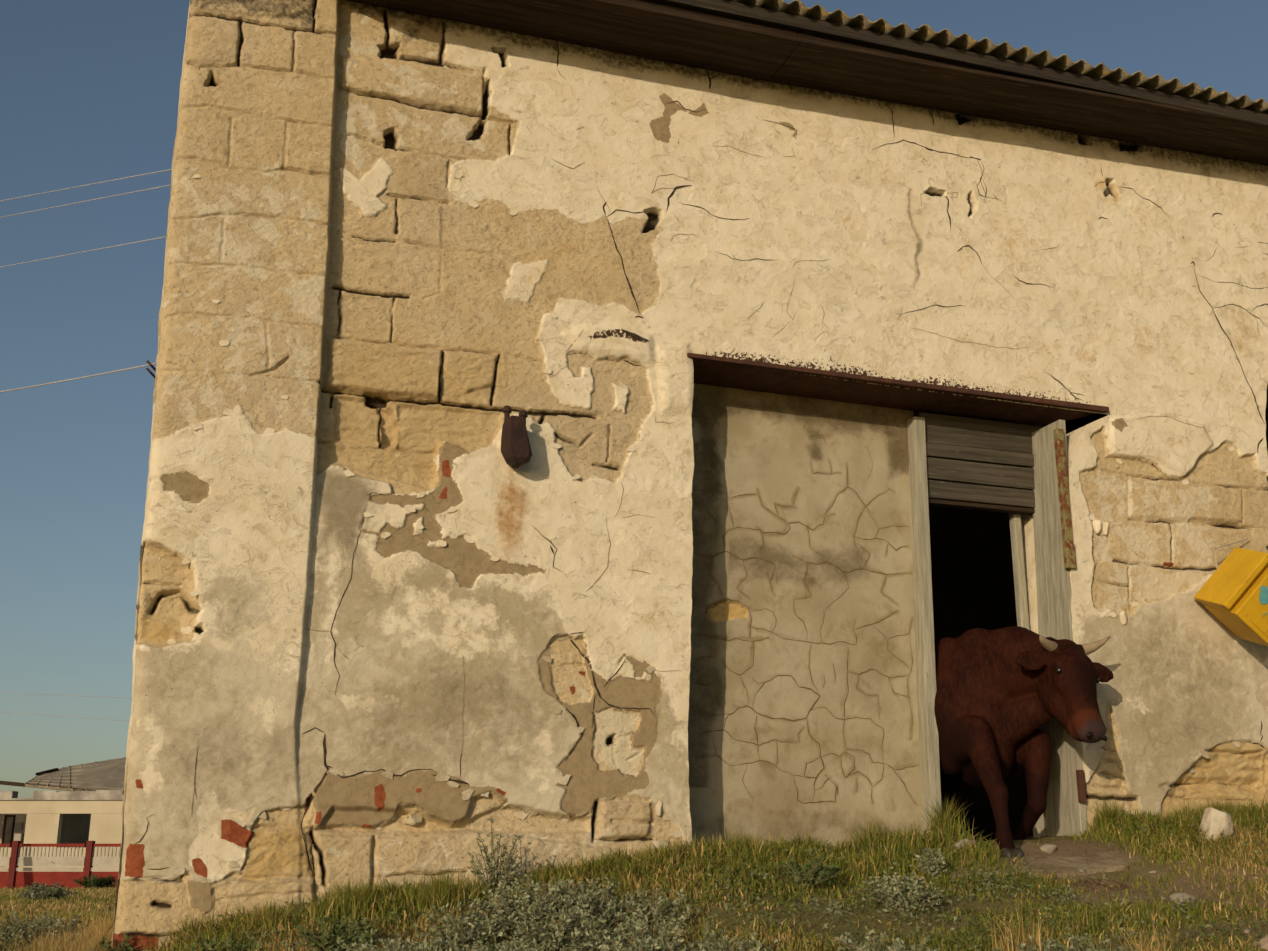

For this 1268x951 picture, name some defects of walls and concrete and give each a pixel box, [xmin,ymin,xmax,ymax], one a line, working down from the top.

spalling [152,0,664,593]
peeling [647,91,711,146]
crack [553,159,828,338]
crack [877,105,1050,297]
crack [1190,213,1268,452]
spalling [136,536,204,651]
crack [558,435,919,806]
spalling [1077,415,1268,625]
crack [301,656,469,874]
spalling [112,629,686,951]
spalling [1085,697,1144,835]
spalling [1159,737,1268,820]